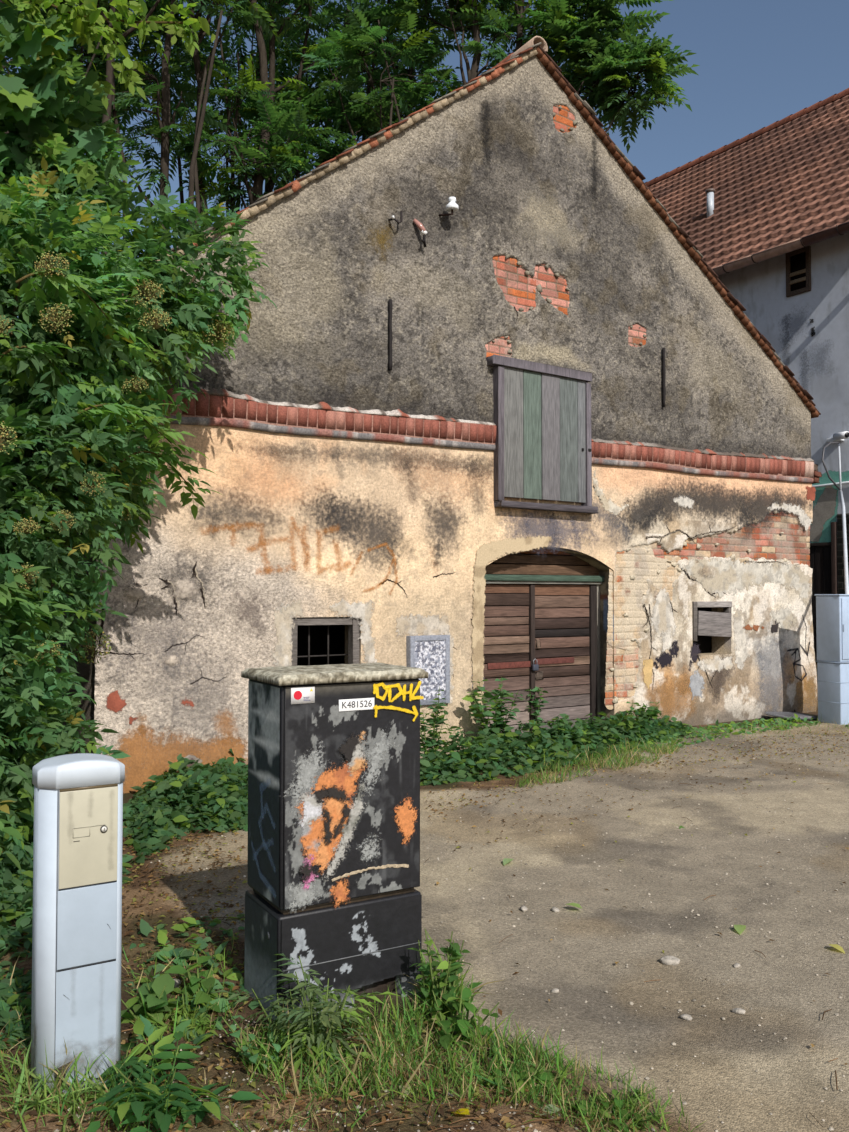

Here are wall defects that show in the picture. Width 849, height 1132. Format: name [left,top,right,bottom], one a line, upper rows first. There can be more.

spalling [493,254,570,315]
spalling [485,336,512,357]
water stain [200,495,273,526]
water stain [317,496,402,563]
water stain [428,502,460,549]
water stain [509,482,815,548]
crack [646,525,737,543]
crack [135,562,207,615]
spalling [604,470,849,710]
crack [99,609,223,684]
crack [642,567,727,694]
spalling [106,690,138,725]